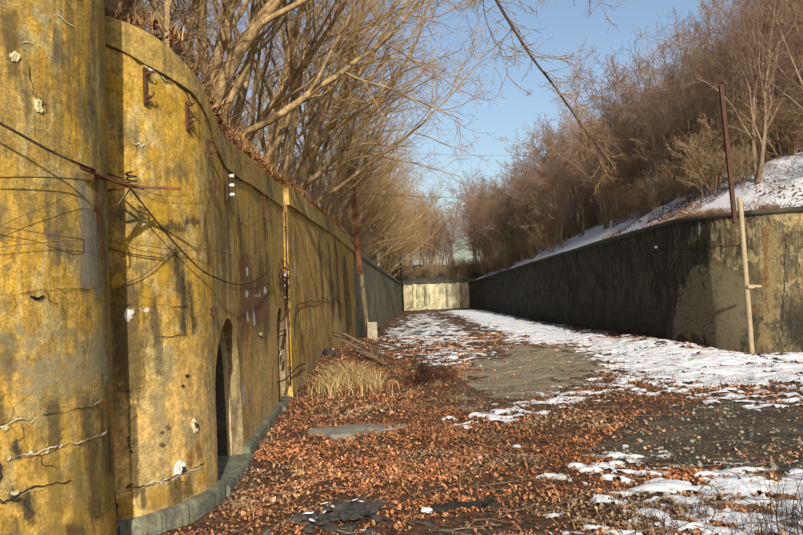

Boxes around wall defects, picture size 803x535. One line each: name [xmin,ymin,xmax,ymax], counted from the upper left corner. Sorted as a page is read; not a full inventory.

peeling [147,184,176,227]
peeling [124,286,152,321]
water stain [47,400,61,446]
crack [0,387,145,514]
water stain [80,395,112,516]
spalling [174,460,186,475]
water stain [10,490,33,535]